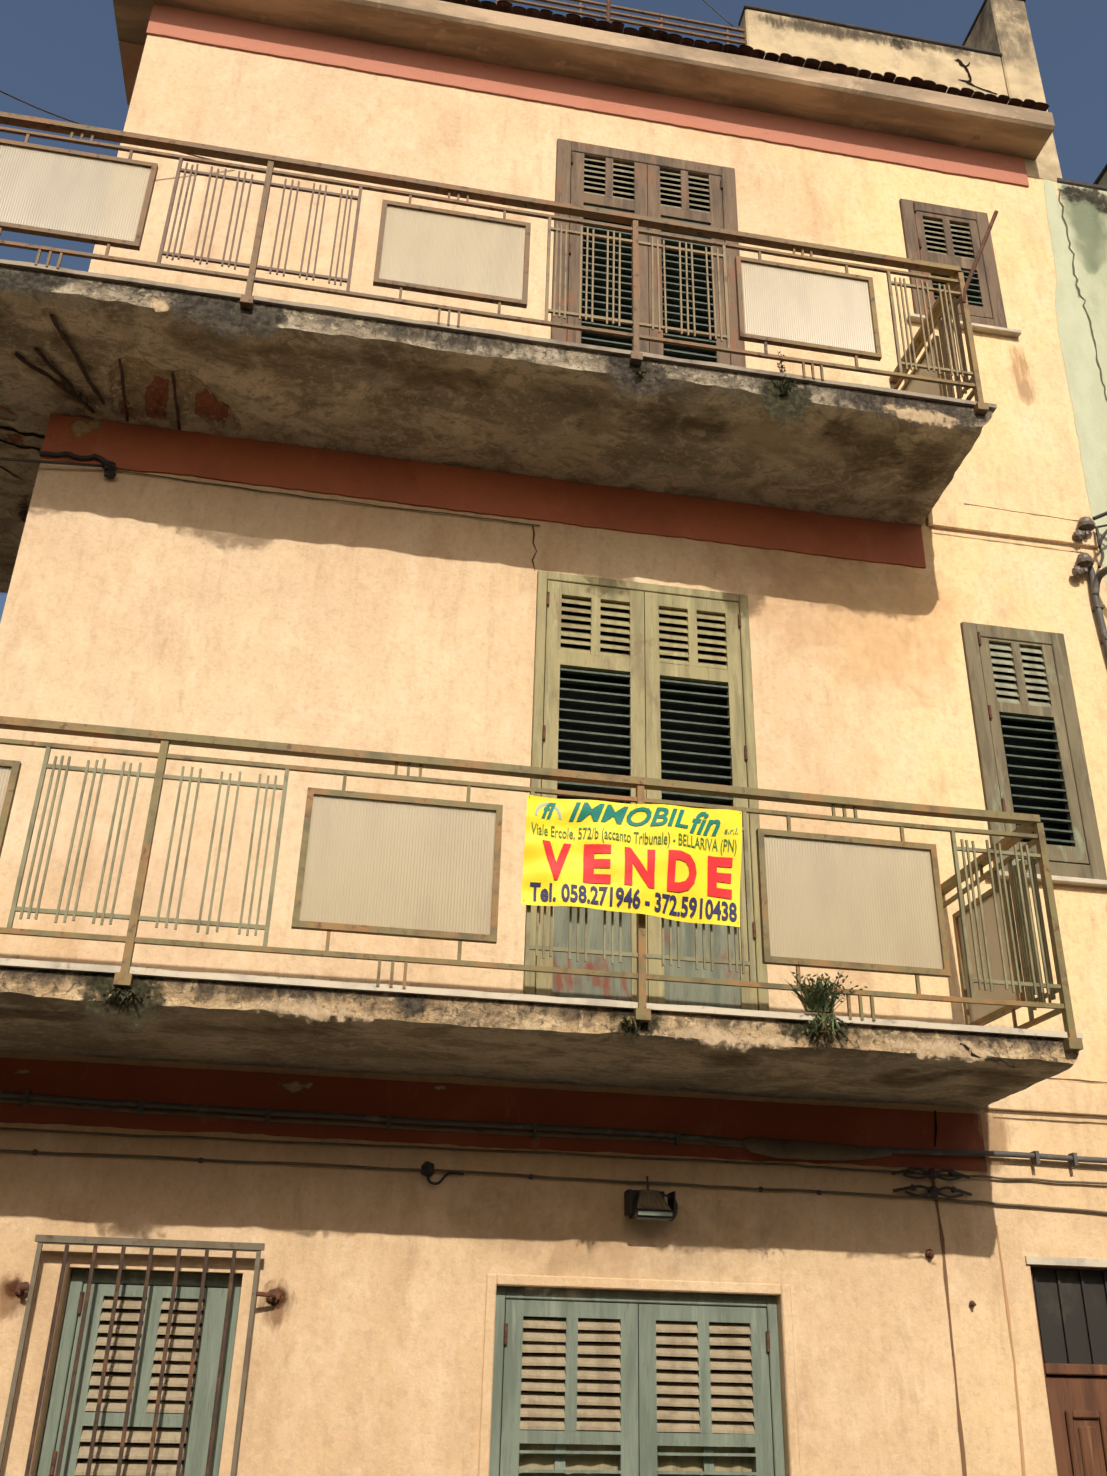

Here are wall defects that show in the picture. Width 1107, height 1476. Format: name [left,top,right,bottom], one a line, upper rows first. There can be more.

water stain [168,291,288,338]
crack [1059,190,1107,400]
spalling [14,314,240,437]
crack [0,426,45,479]
crack [930,503,1090,549]
water stain [79,967,165,1029]
water stain [197,980,338,1000]
water stain [397,986,427,1017]
water stain [607,999,661,1041]
water stain [779,1019,848,1049]
corrosion [6,1280,19,1296]
corrosion [271,1288,286,1308]